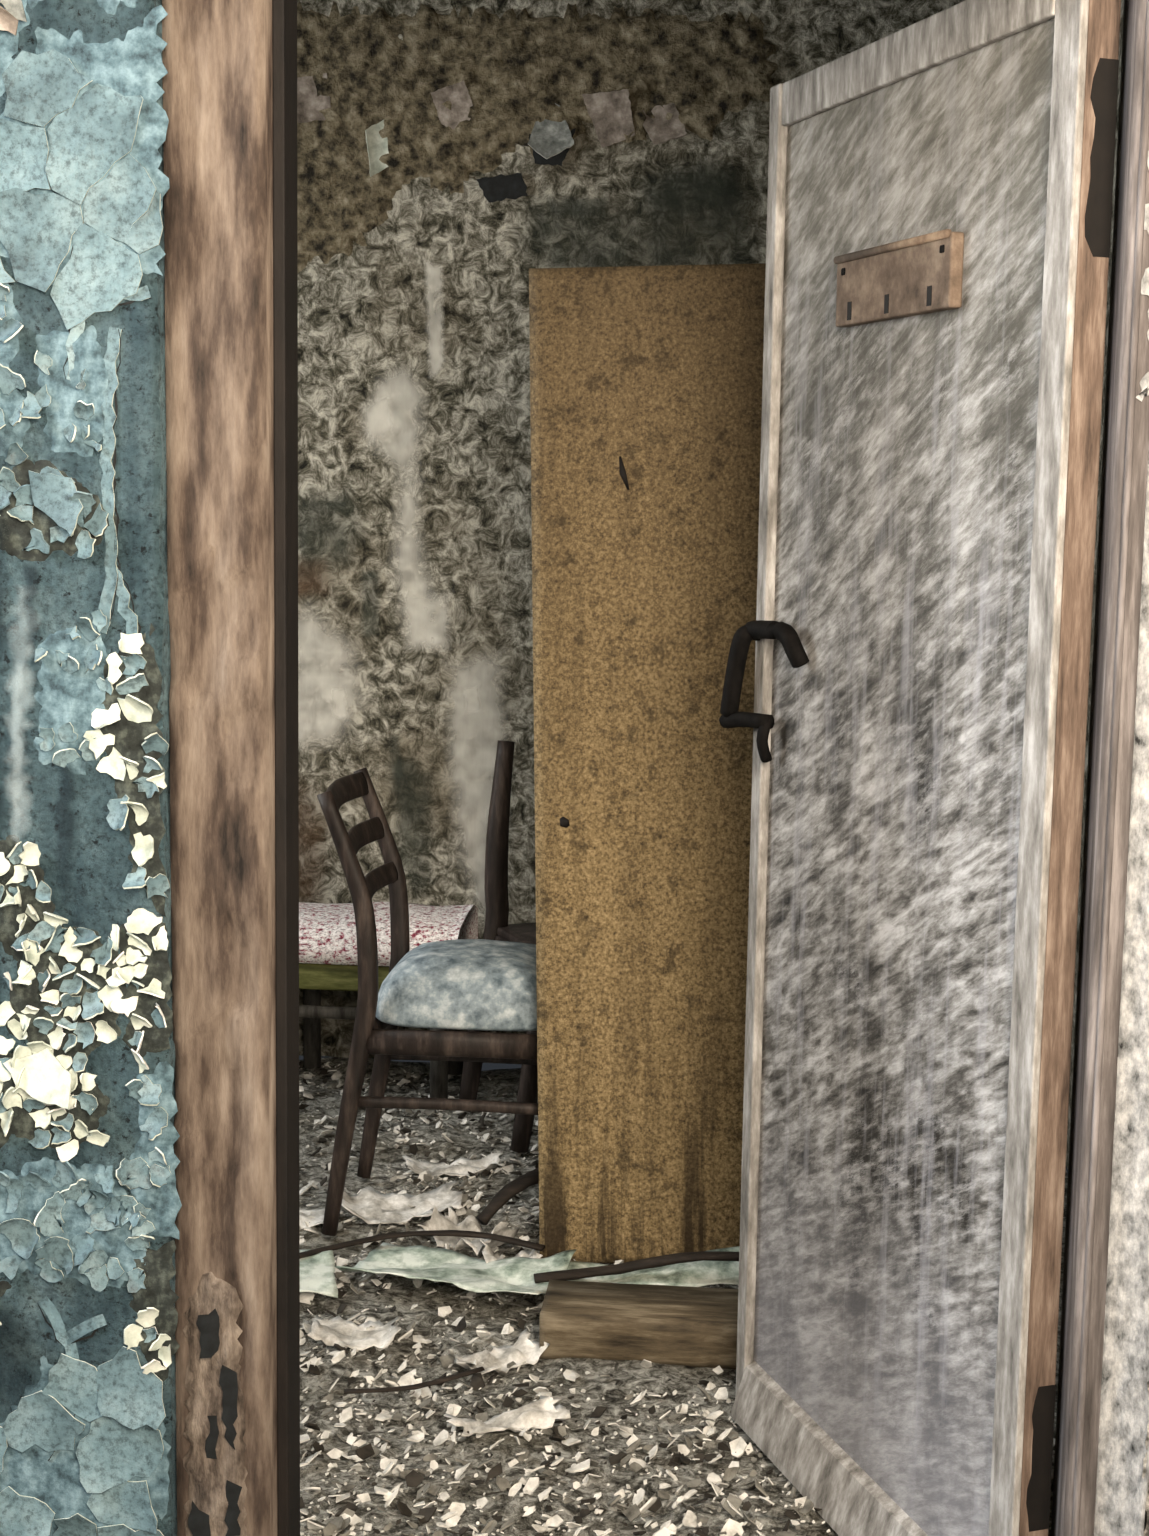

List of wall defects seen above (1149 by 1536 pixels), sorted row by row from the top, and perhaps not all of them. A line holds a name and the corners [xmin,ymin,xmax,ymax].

flaking render [297,1,778,273]
peeling [0,0,170,561]
peeling [1141,267,1149,341]
peeling [1136,372,1149,402]
spalling [619,456,629,490]
peeling [0,610,242,1536]
crack [37,1295,108,1373]